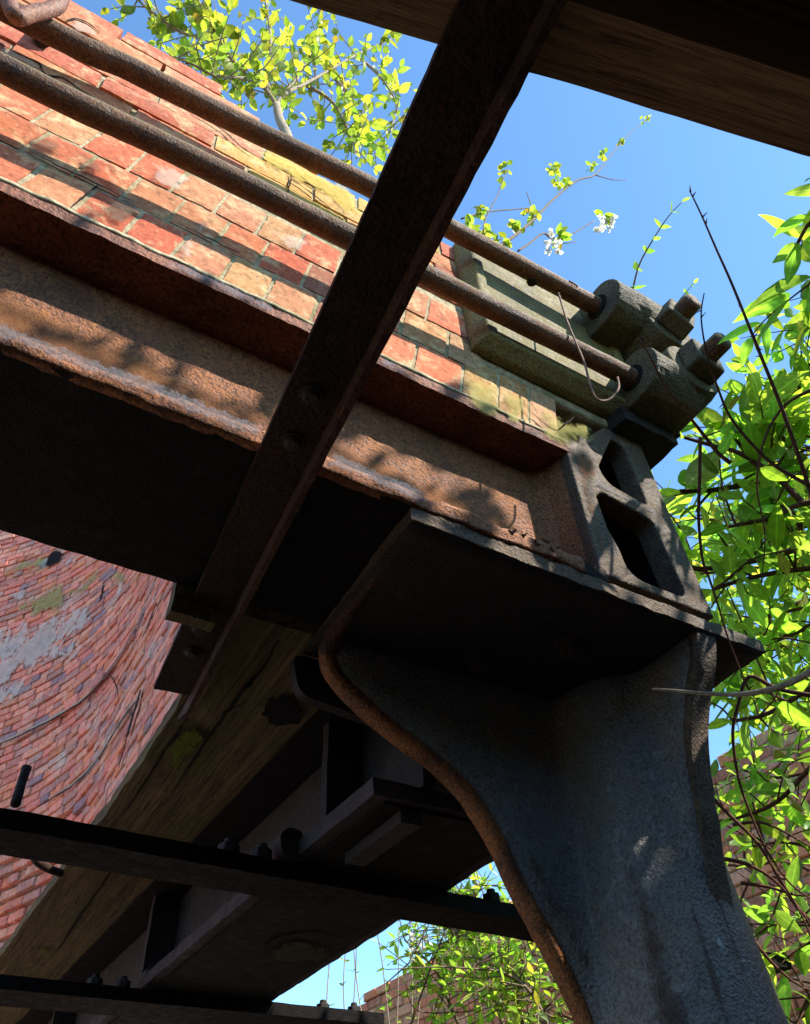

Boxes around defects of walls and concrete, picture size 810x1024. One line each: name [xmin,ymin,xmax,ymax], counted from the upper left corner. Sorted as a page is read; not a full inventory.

corrosion [509,528,560,553]
spalling [45,550,61,566]